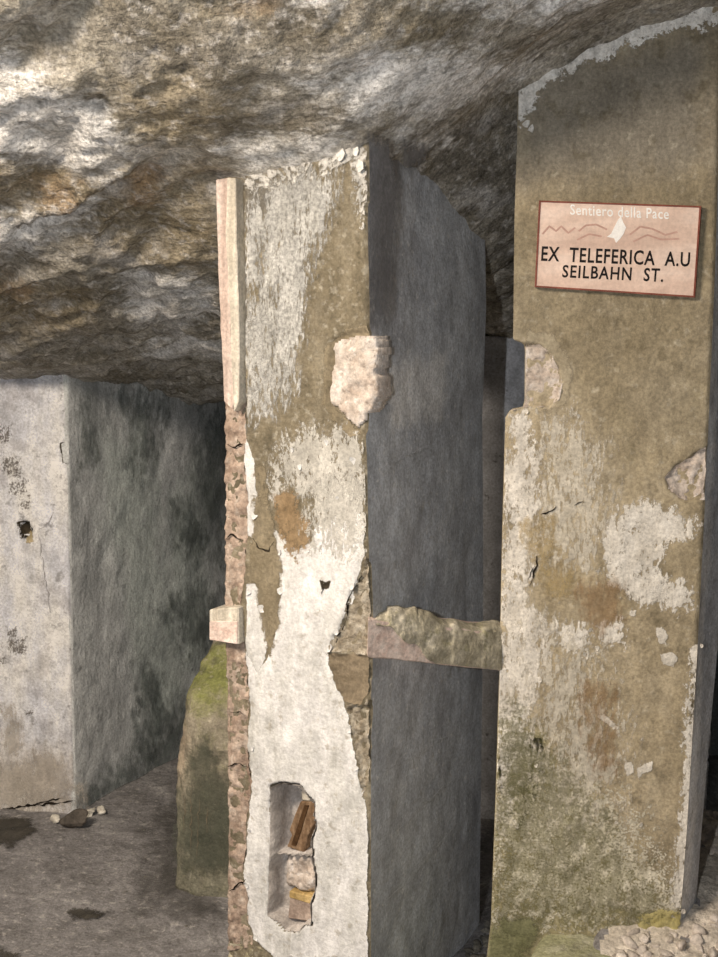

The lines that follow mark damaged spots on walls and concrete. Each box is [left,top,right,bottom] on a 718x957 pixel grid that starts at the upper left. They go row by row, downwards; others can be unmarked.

peeling [224,325,391,957]